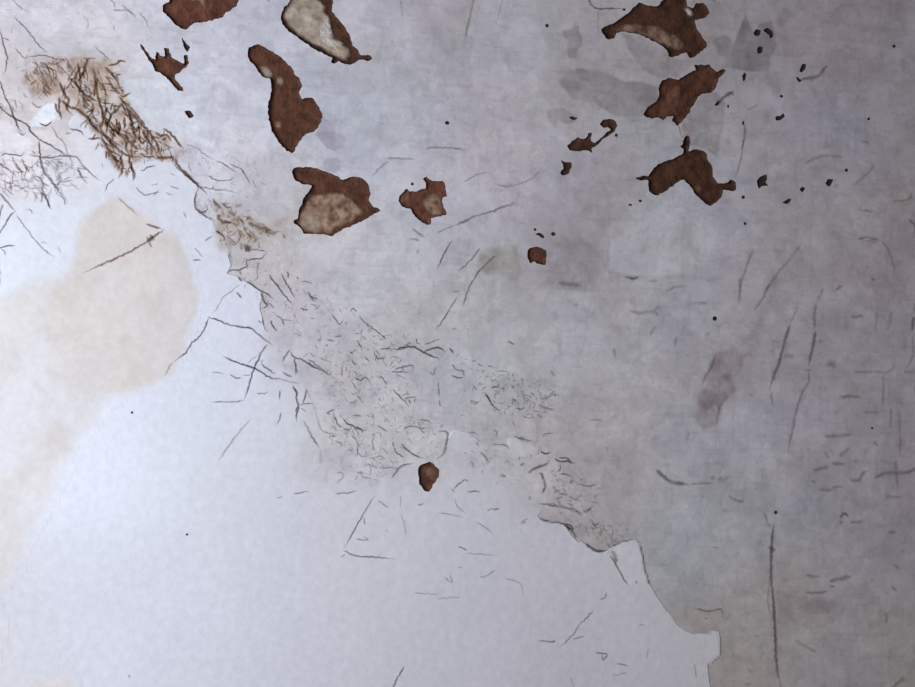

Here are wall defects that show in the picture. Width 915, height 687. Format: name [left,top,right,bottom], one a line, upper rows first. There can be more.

crack [0,19,109,248]
corrosion [19,51,196,184]
crack [98,224,159,266]
crack [180,163,247,233]
damp [0,190,204,592]
crack [180,250,538,475]
peeling [0,103,720,687]
crack [503,452,631,582]